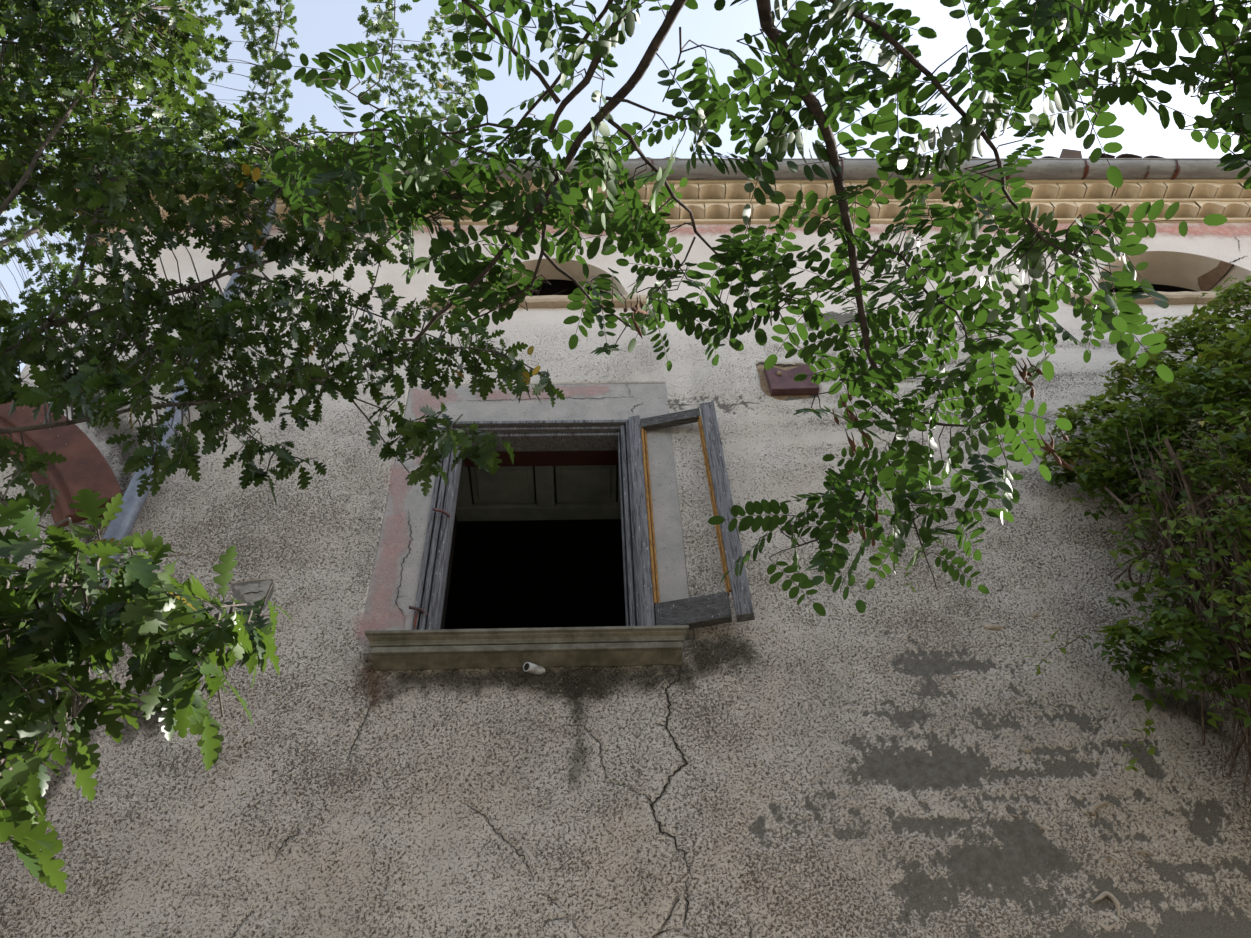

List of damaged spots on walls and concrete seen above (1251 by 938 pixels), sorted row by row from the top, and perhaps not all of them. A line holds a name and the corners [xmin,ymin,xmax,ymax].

leakage [1144,686,1220,733]
crack [463,803,584,938]
crack [580,673,691,938]